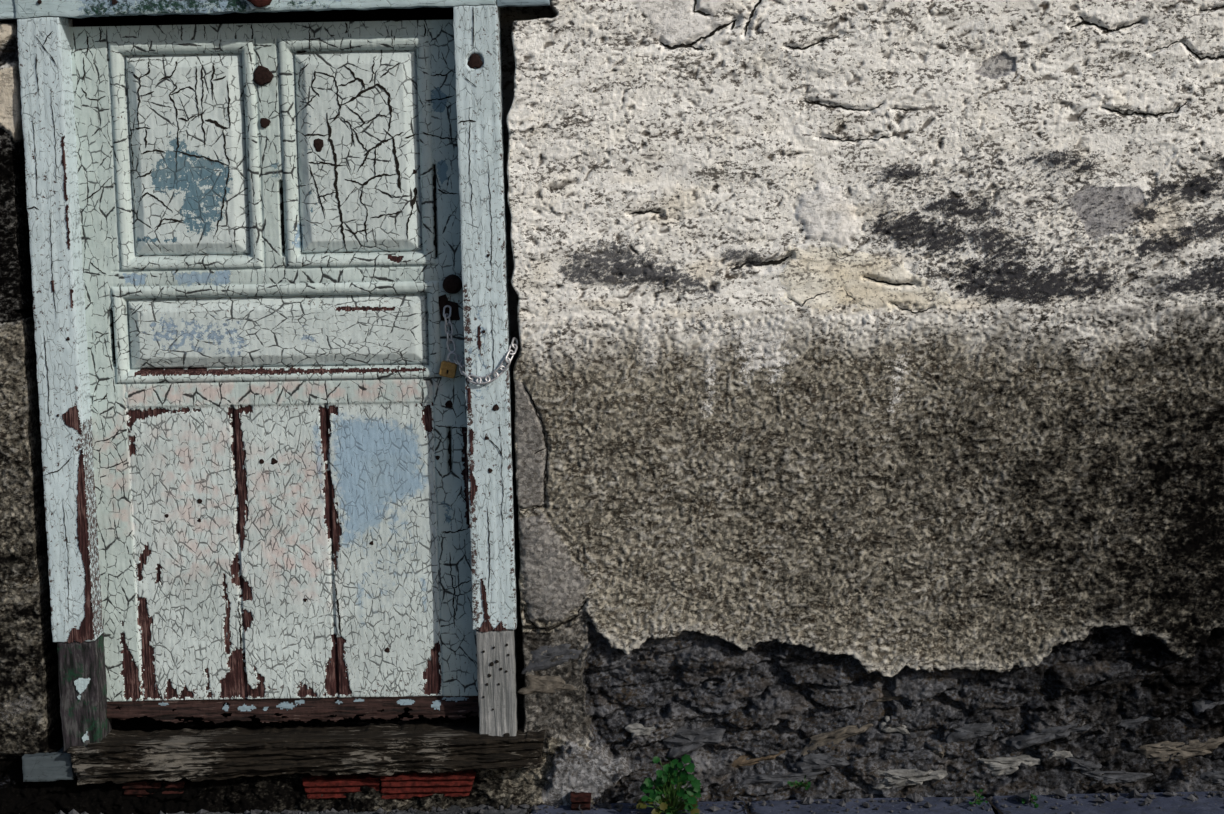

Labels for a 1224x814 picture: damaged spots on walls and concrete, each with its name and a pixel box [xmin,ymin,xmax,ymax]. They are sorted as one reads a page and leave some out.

crack [660,0,762,50]
crack [1071,16,1140,32]
crack [786,34,840,50]
crack [1149,41,1224,60]
crack [1102,102,1187,116]
crack [801,100,911,142]
crack [630,208,661,216]
crack [731,256,789,270]
crack [788,247,934,314]
peeling [479,579,507,632]
flaking render [517,605,1224,809]